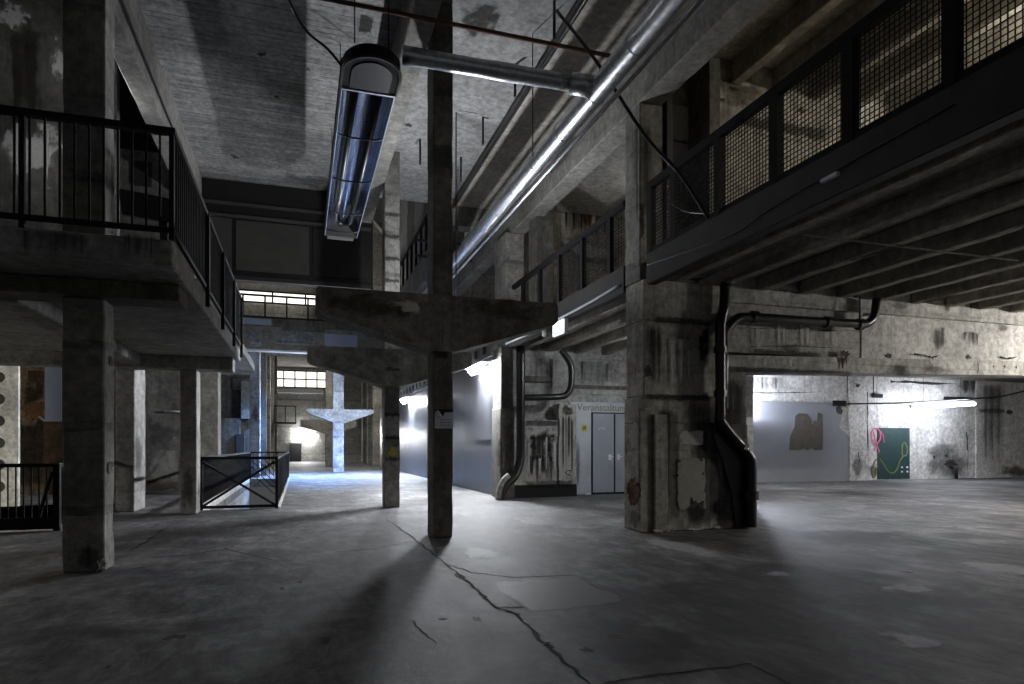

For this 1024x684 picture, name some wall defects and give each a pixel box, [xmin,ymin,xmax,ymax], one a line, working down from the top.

crack [340,518,791,684]